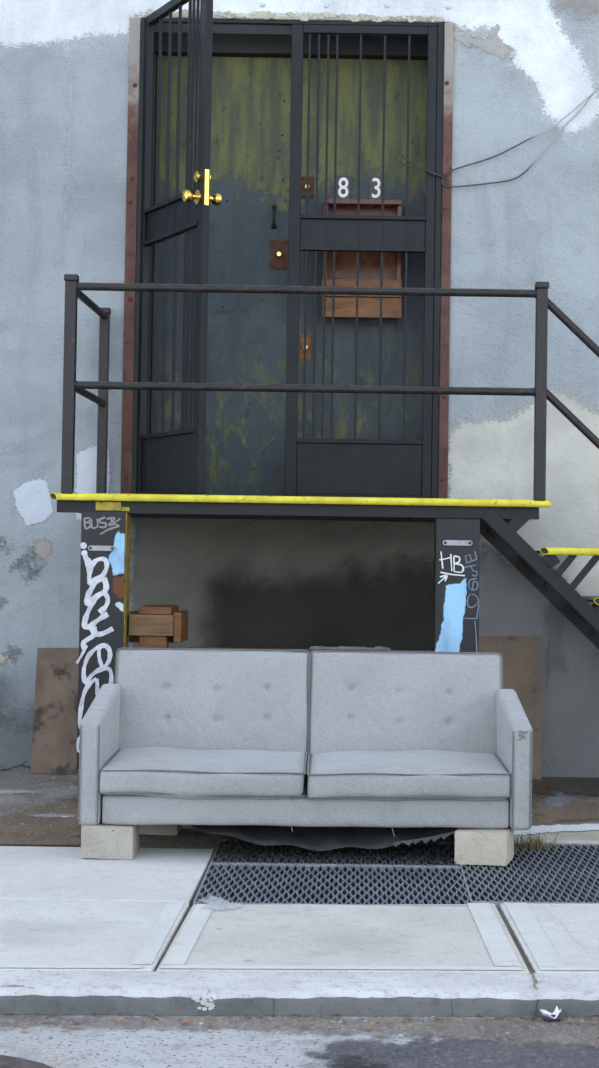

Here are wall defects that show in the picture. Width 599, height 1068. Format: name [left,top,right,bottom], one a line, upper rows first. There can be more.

flaking render [213,11,514,60]